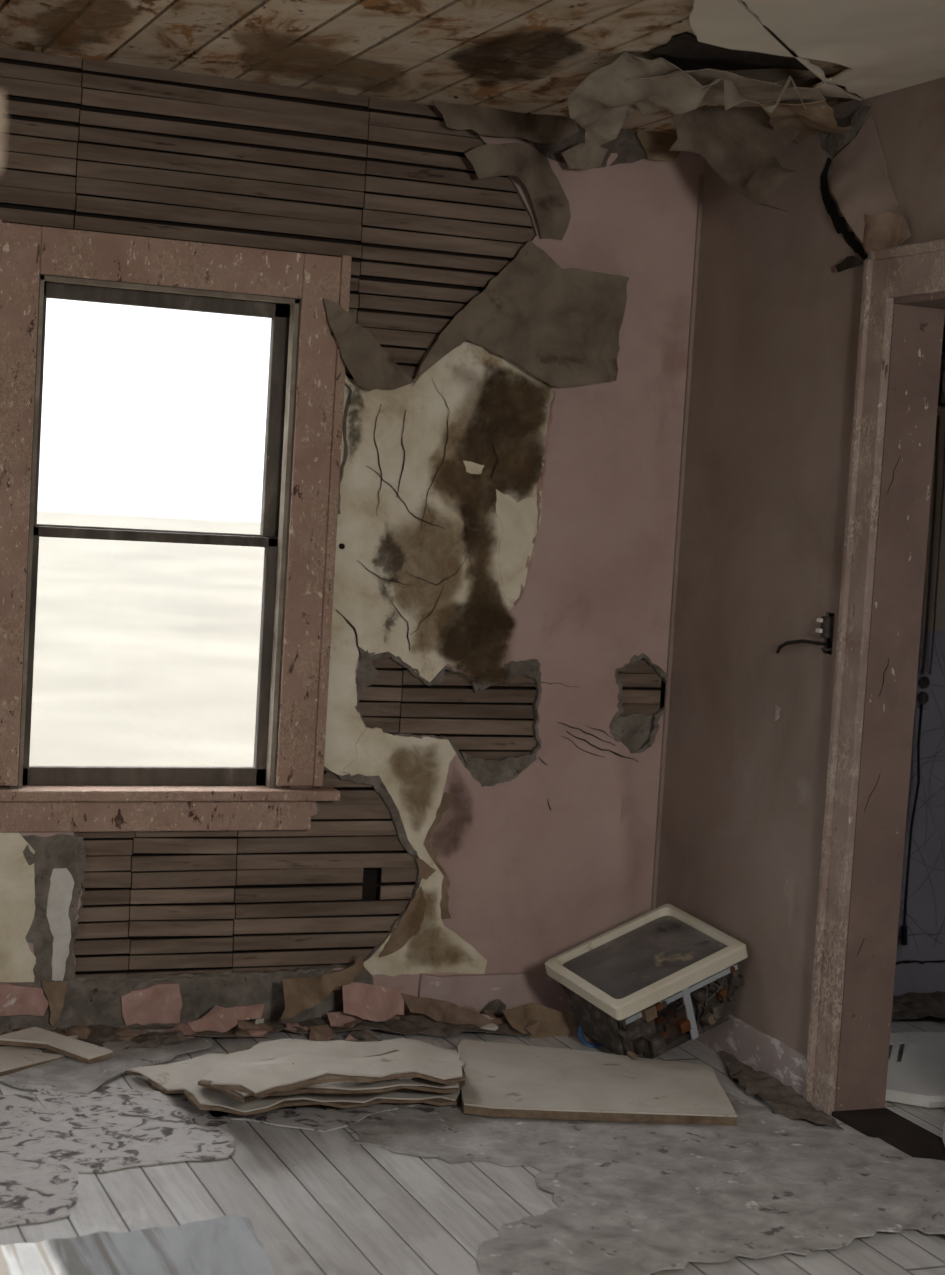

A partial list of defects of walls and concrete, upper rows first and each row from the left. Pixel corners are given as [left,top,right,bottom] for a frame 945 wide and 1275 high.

damp [234,34,404,92]
damp [447,32,584,86]
flaking render [597,129,681,168]
peeling [819,106,911,272]
damp [349,389,363,450]
flaking render [0,47,585,1035]
damp [374,367,546,683]
flaking render [609,653,667,753]